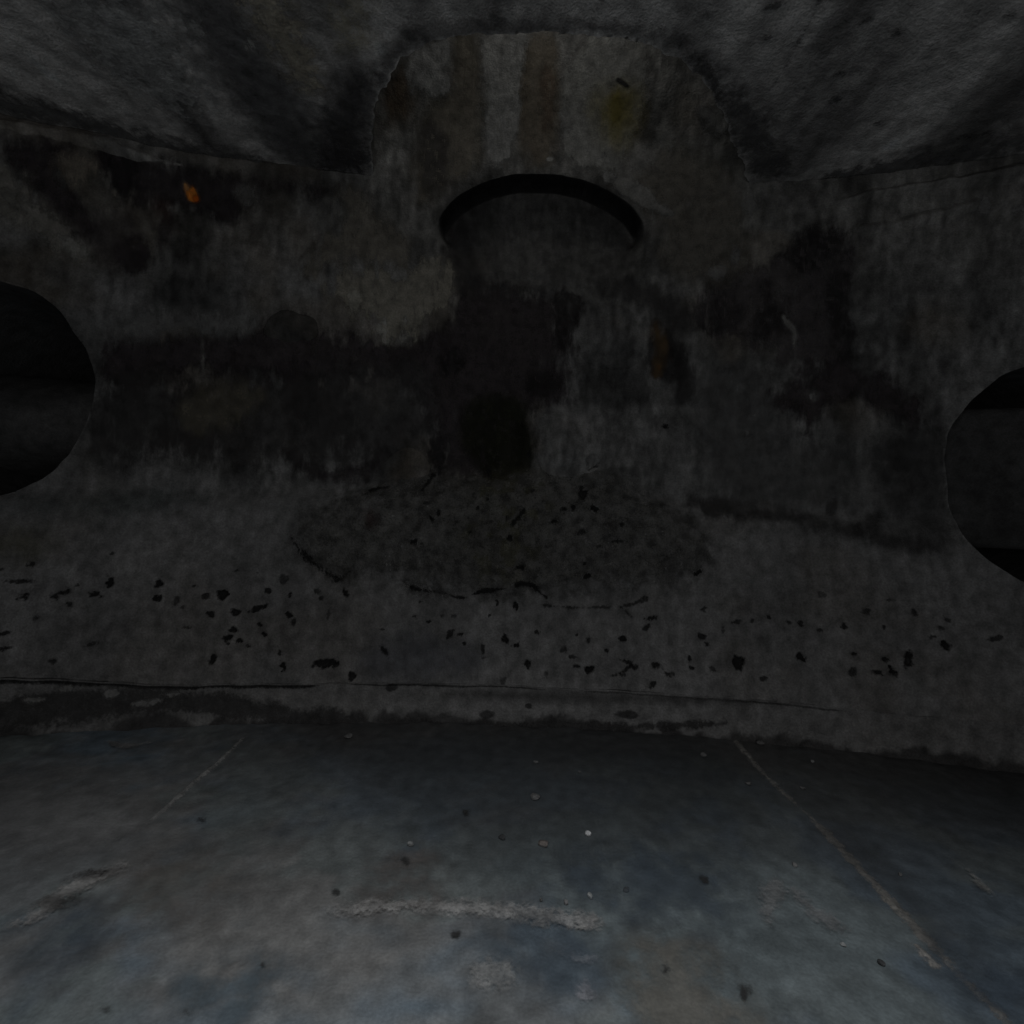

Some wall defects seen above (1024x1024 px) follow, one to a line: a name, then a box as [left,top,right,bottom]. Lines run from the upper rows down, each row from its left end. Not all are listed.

rust [184,183,199,202]
leakage [599,226,920,435]
leakage [688,495,931,552]
spalling [192,575,292,648]
spalling [312,659,339,670]